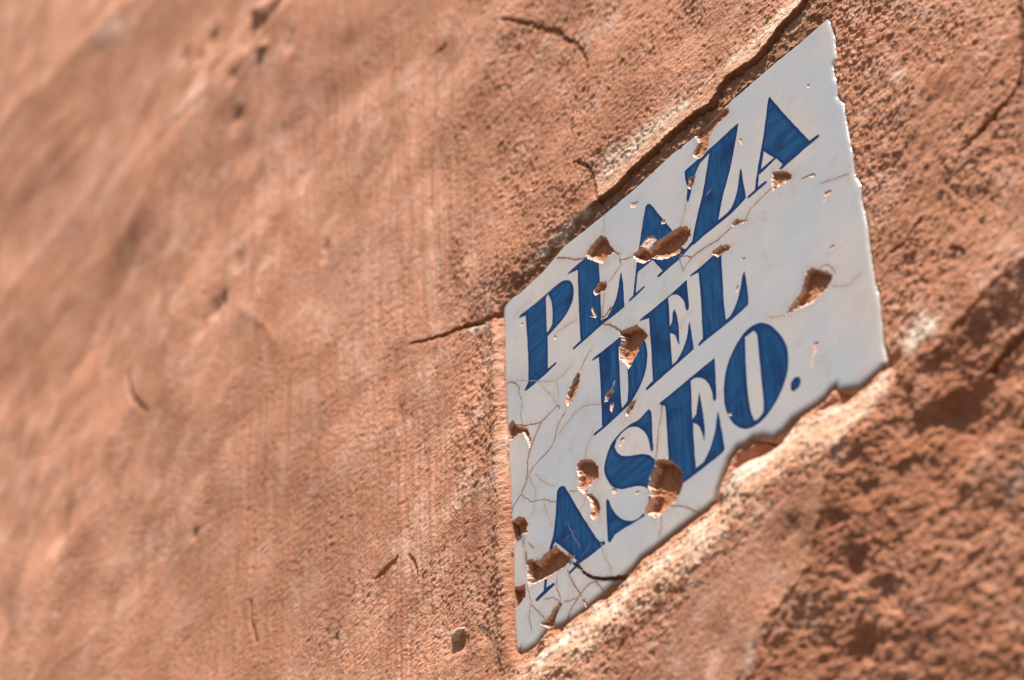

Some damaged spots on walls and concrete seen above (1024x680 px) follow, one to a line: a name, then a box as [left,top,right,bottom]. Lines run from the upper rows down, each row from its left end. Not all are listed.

crack [502,18,588,70]
spalling [498,0,843,309]
crack [574,0,808,332]
crack [412,313,504,344]
spalling [619,324,648,369]
spalling [508,419,531,448]
crack [506,349,629,630]
spalling [576,459,601,521]
spalling [635,459,683,518]
spalling [748,255,1024,680]
spalling [514,545,574,609]